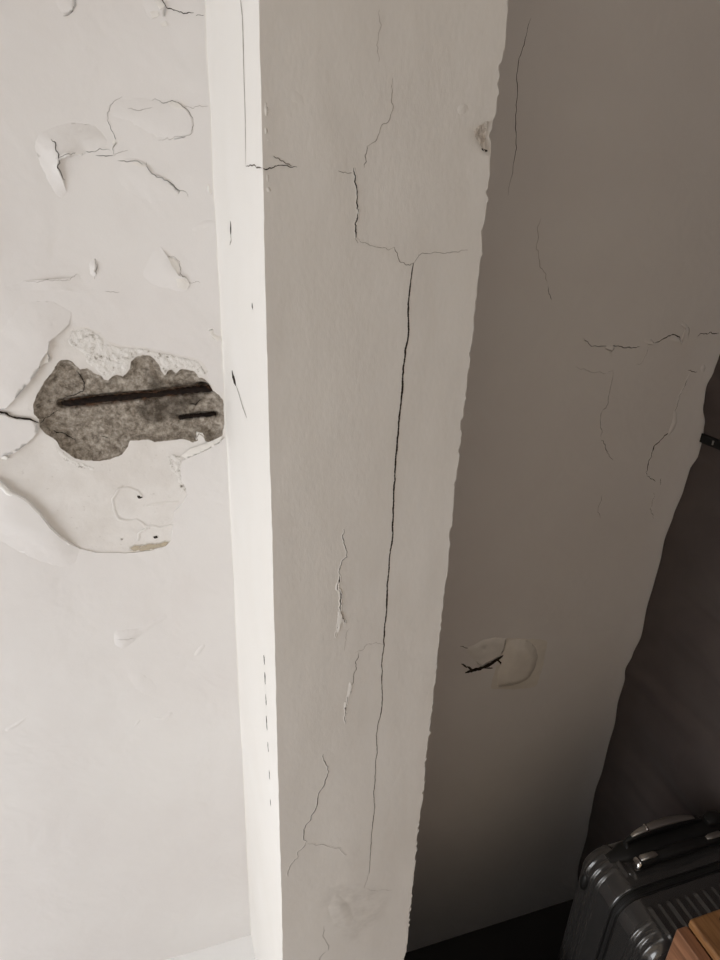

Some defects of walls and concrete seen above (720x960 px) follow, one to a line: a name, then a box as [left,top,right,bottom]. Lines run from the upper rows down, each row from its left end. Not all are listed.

crack [238,0,246,107]
crack [245,130,295,170]
crack [508,19,531,192]
spalling [0,301,225,567]
crack [334,79,460,891]
crack [576,321,719,460]
crack [645,370,696,519]
crack [286,754,347,877]